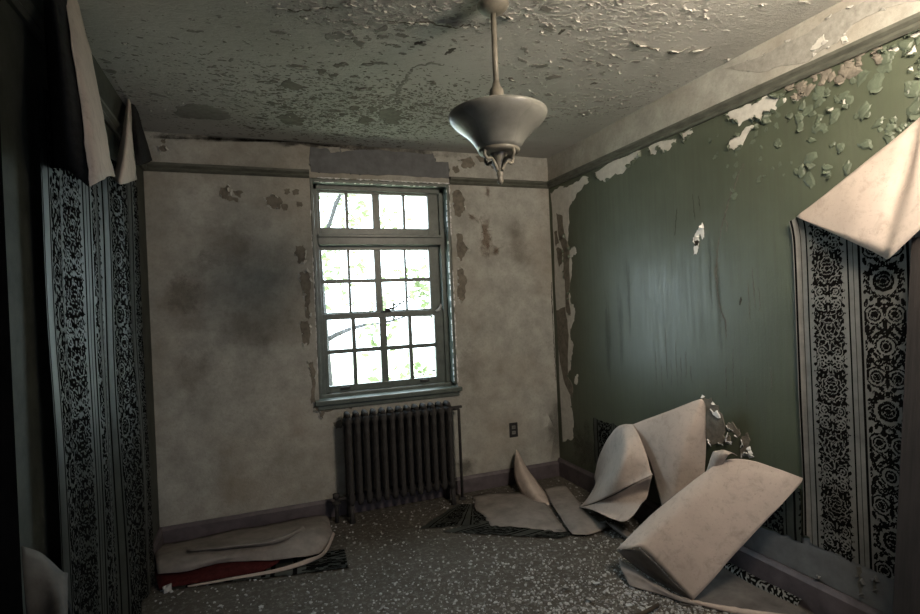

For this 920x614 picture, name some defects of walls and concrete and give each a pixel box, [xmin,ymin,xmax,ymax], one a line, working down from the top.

peeling [294,231,352,421]
peeling [98,0,783,383]
peeling [550,128,693,442]
peeling [724,93,799,153]
spalling [700,395,754,458]